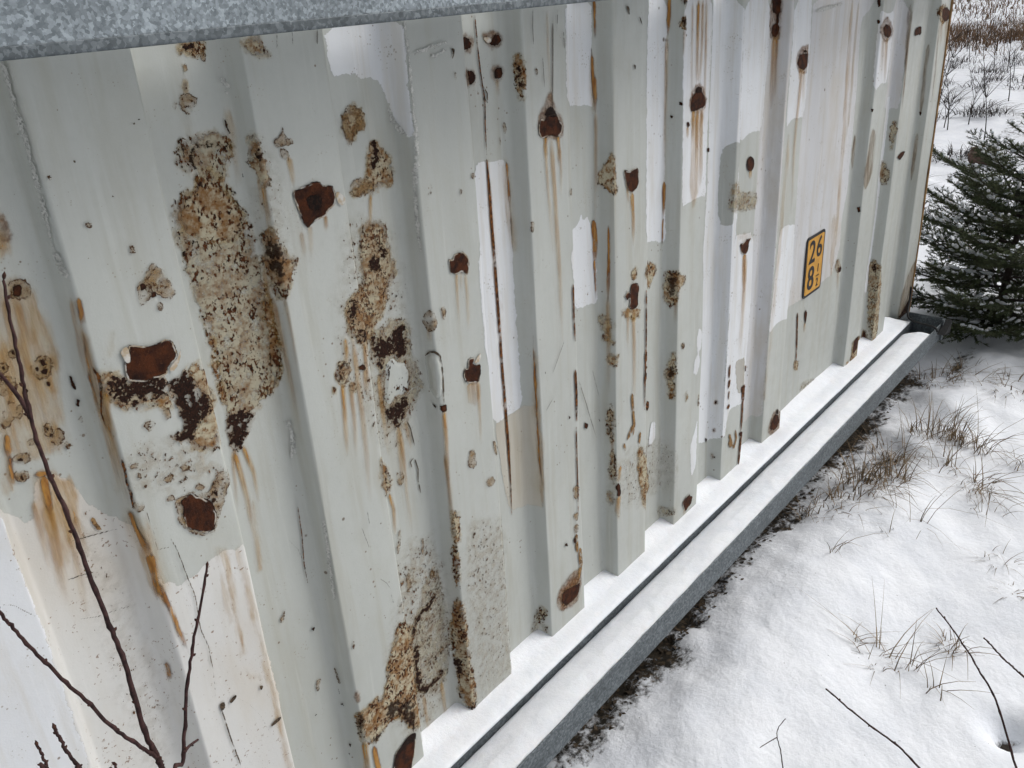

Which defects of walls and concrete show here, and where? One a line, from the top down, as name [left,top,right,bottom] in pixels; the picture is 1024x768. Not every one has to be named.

corrosion [293,140,394,228]
corrosion [8,278,31,301]
corrosion [76,298,84,322]
corrosion [85,120,299,536]
corrosion [333,218,423,446]
corrosion [0,349,72,521]
corrosion [349,512,511,768]
corrosion [557,534,583,611]